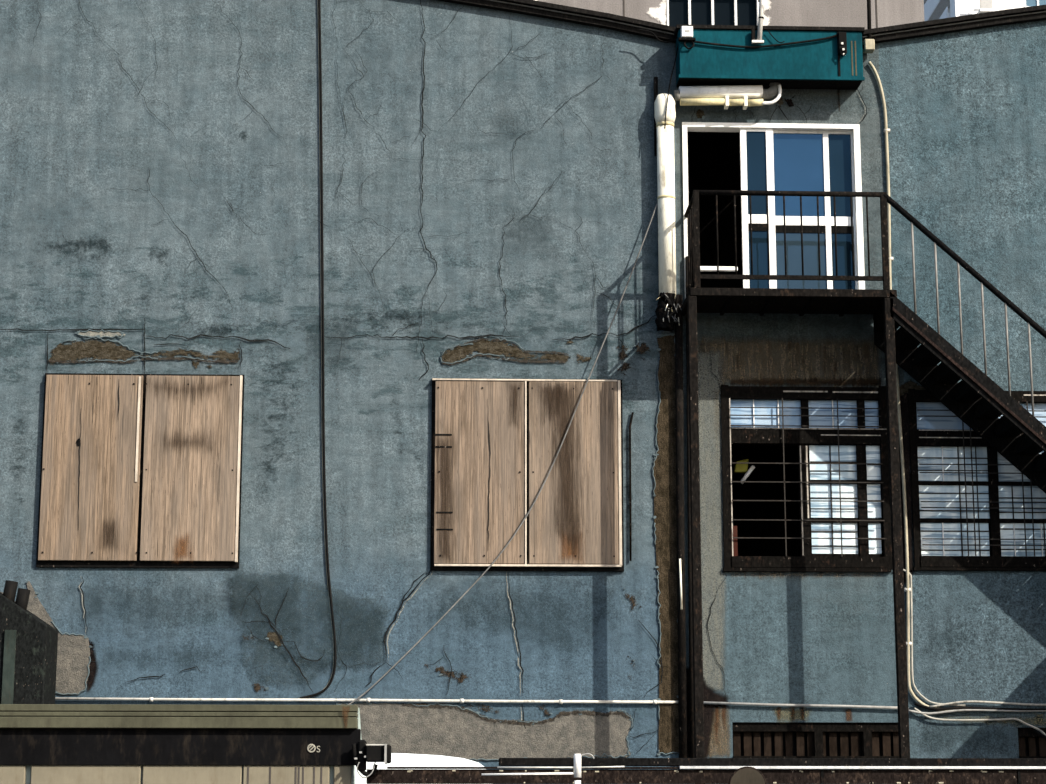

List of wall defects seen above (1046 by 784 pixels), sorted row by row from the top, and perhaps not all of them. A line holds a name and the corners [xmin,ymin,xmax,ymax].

crack [63,0,270,235]
crack [212,0,294,199]
crack [311,0,655,380]
peeling [48,329,240,370]
crack [0,170,290,374]
peeling [440,337,592,366]
leakage [698,337,881,758]
peeling [26,581,92,695]
crack [238,572,433,692]
crack [427,649,461,693]
peeling [336,702,633,783]
crack [506,572,526,729]